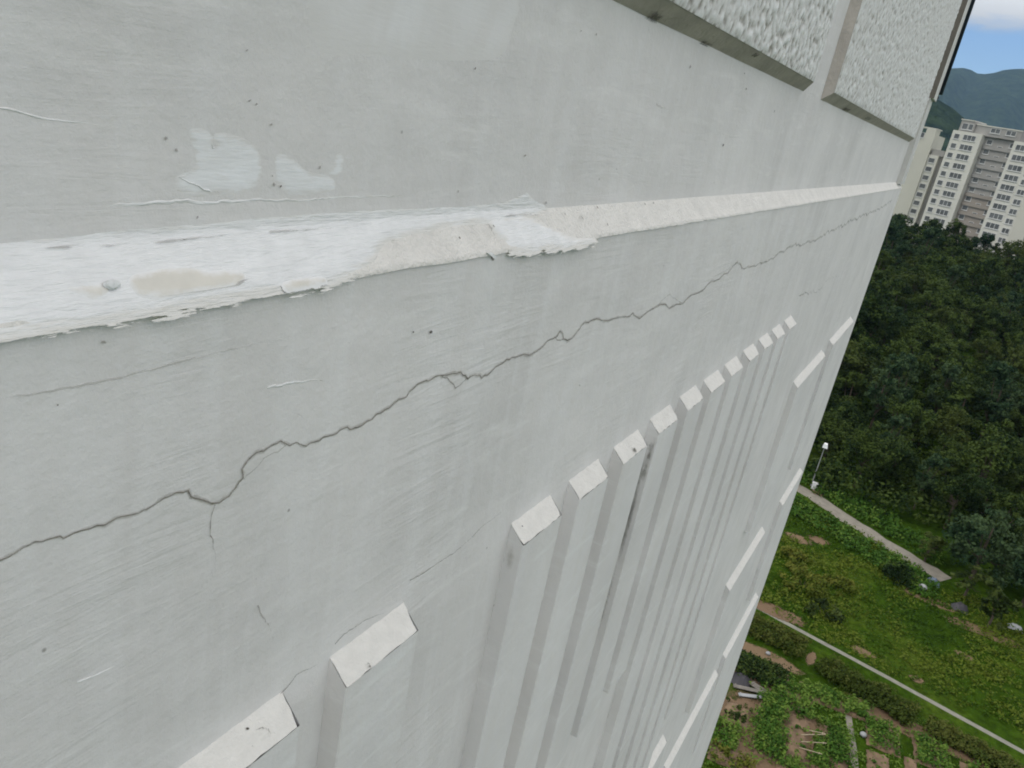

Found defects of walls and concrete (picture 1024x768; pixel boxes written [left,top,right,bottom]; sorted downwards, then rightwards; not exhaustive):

peeling [129,268,246,299]
peeling [281,276,328,293]
crack [0,304,677,561]